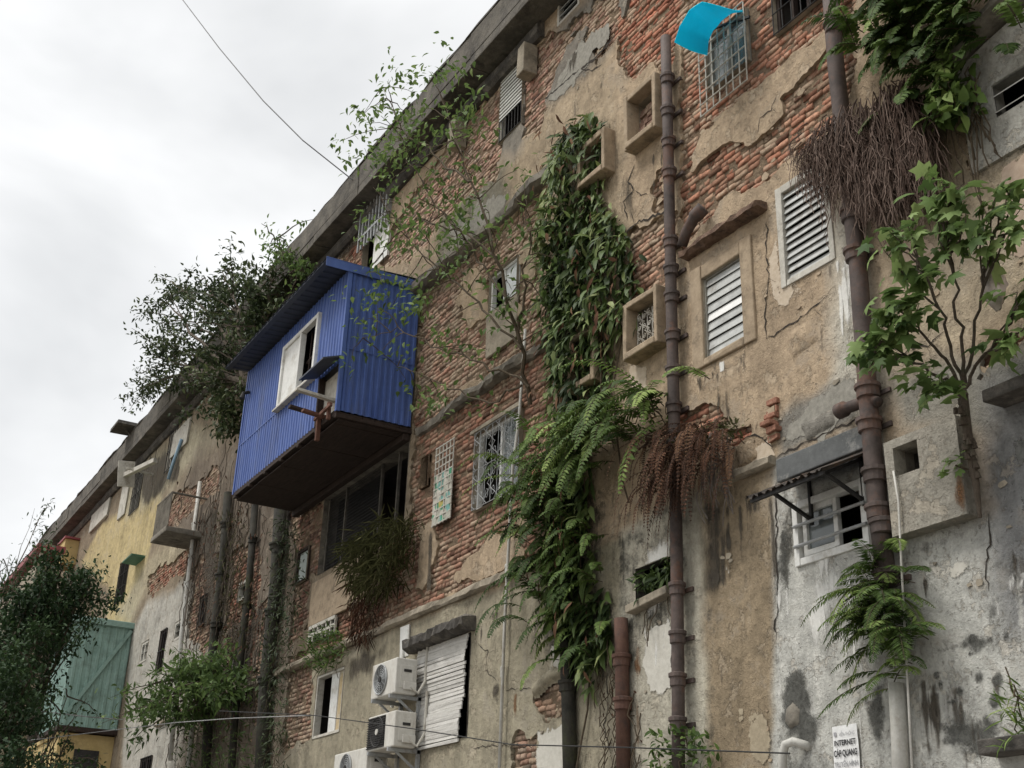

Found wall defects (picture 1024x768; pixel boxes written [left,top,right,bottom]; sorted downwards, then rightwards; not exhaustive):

crack [623,167,664,232]
spalling [522,0,833,309]
crack [764,221,828,339]
spalling [284,90,553,754]
flaking render [663,378,856,462]
damp [706,496,756,589]
crack [773,484,781,641]
damp [769,500,791,612]
damp [952,632,1009,656]
flaking render [512,683,563,768]
damp [779,670,816,743]
damp [921,672,1002,755]